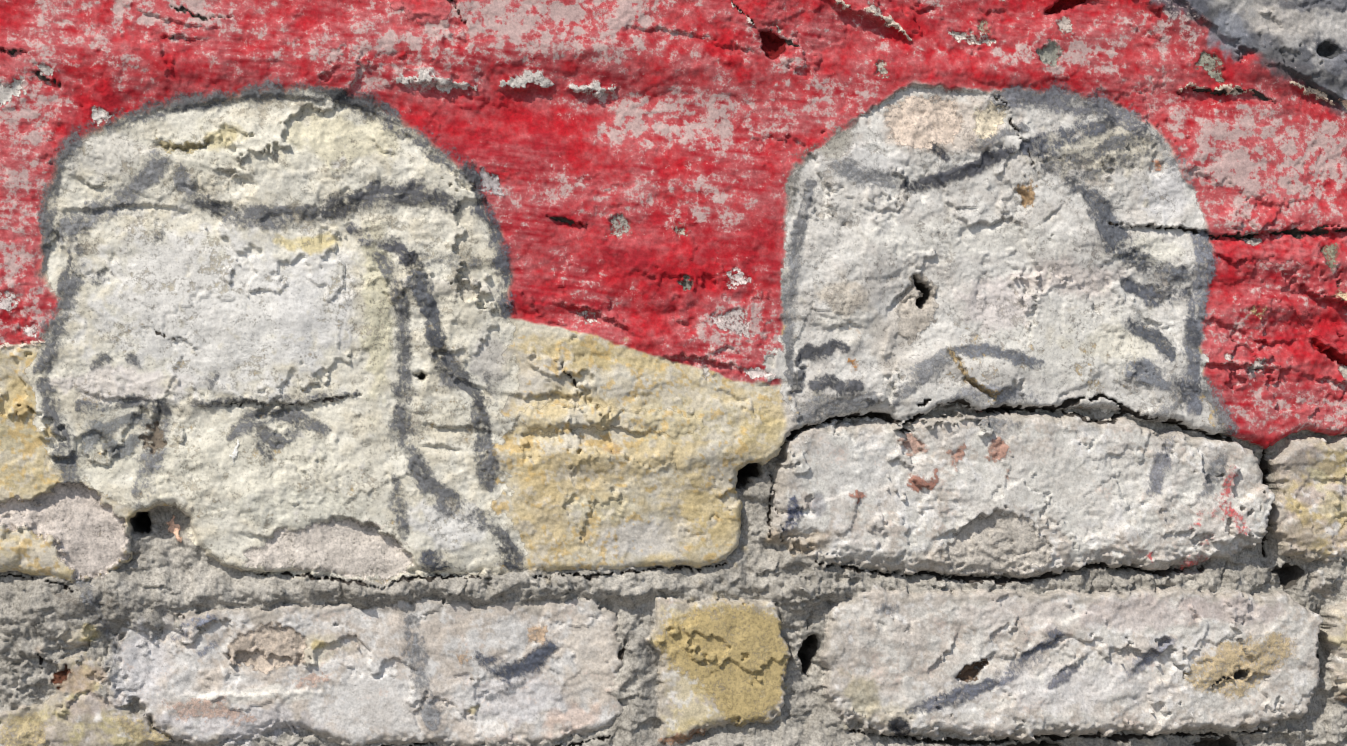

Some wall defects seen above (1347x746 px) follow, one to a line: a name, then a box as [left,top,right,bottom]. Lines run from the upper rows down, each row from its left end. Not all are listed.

peeling [835,0,912,41]
crack [1,49,61,87]
peeling [396,67,478,94]
peeling [499,70,616,98]
peeling [1179,52,1253,96]
peeling [92,107,112,126]
spalling [884,94,1006,149]
spalling [156,136,210,154]
crack [1108,222,1347,240]
peeling [726,267,751,289]
spalling [0,482,131,580]
spalling [243,513,414,585]